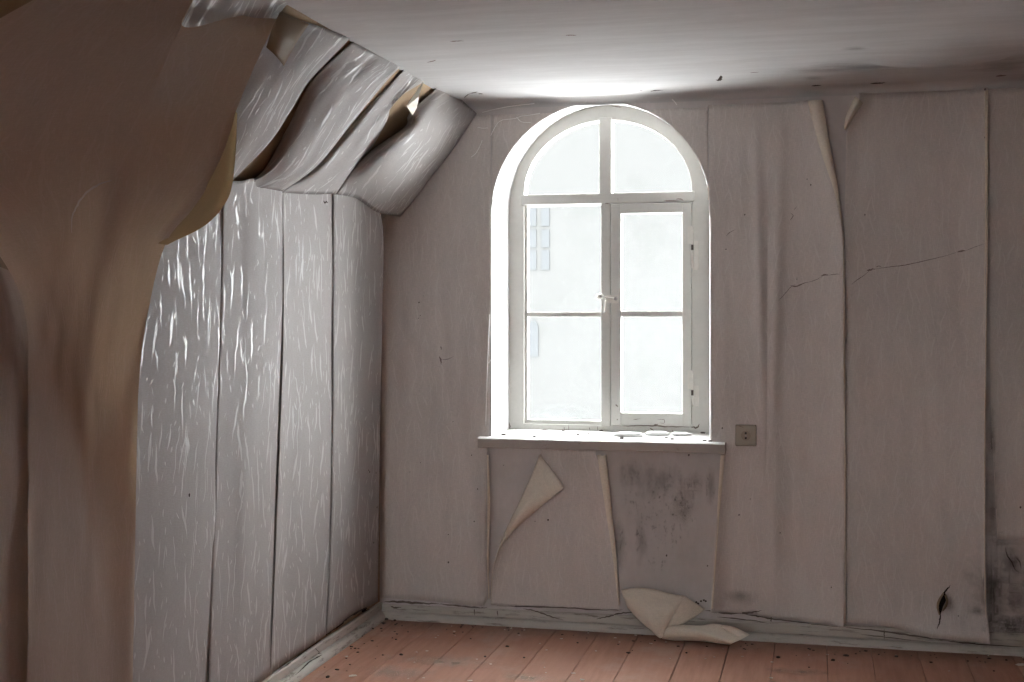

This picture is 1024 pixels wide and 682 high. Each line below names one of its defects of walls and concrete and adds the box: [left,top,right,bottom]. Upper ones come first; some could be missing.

crack [779,245,980,300]